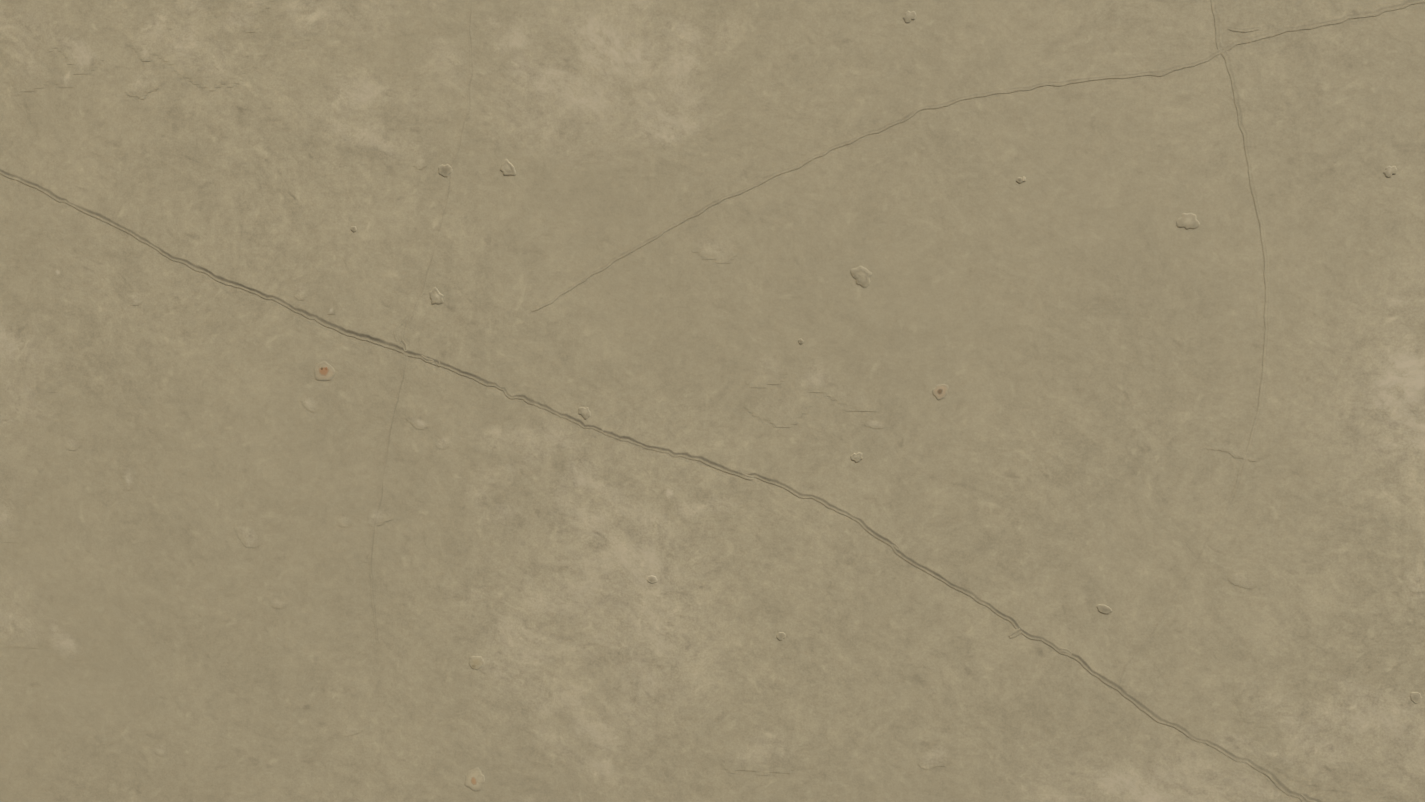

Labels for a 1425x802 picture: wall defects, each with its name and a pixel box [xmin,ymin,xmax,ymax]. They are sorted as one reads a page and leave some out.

crack [0,167,1326,802]